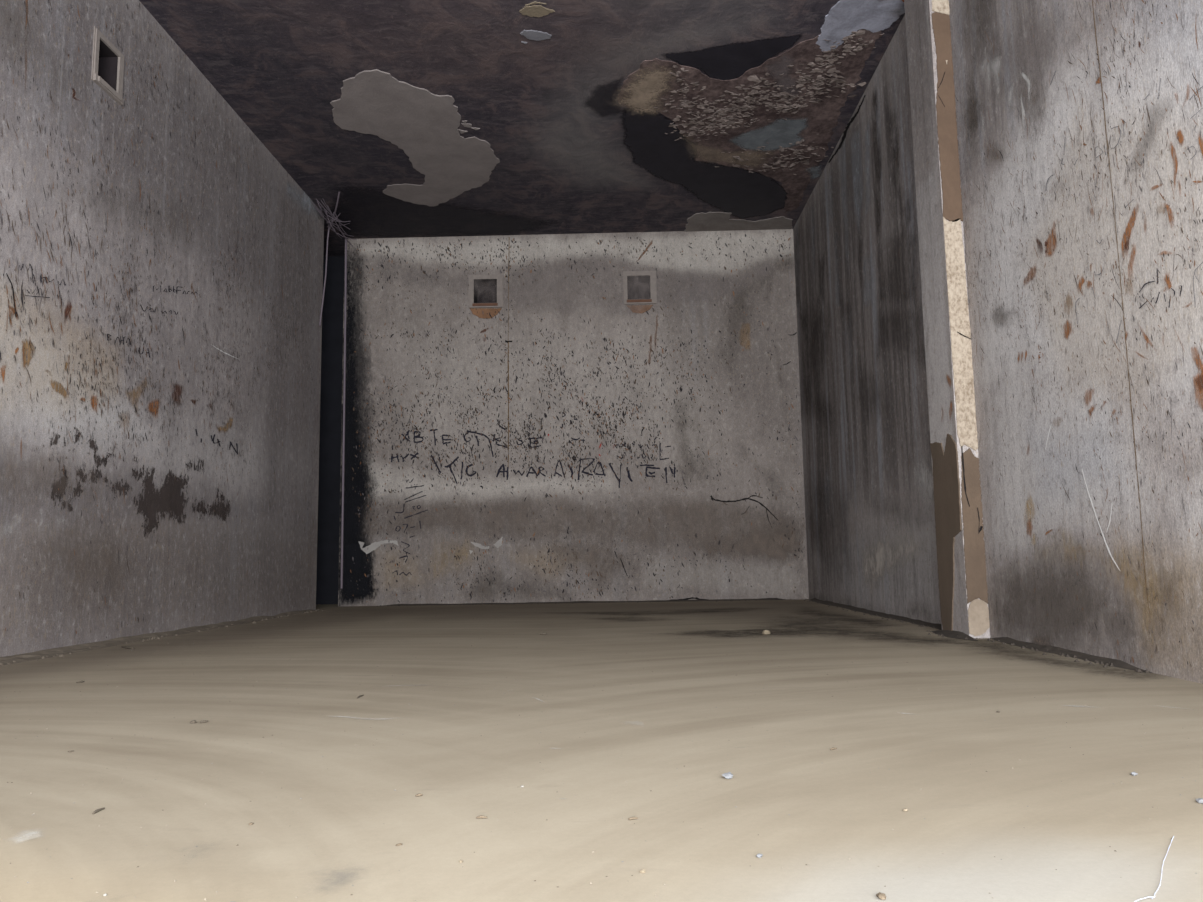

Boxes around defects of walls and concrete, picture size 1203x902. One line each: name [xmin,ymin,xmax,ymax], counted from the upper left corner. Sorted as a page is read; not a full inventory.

peeling [330,69,500,206]
peeling [618,0,905,232]
rust [1152,130,1201,189]
leakage [328,187,547,238]
rust [1037,224,1056,256]
rust [1122,208,1145,270]
peeling [930,0,990,636]
rust [1064,264,1104,339]
rust [15,340,33,368]
rust [47,362,97,409]
rust [1192,347,1203,408]
leakage [338,253,374,606]